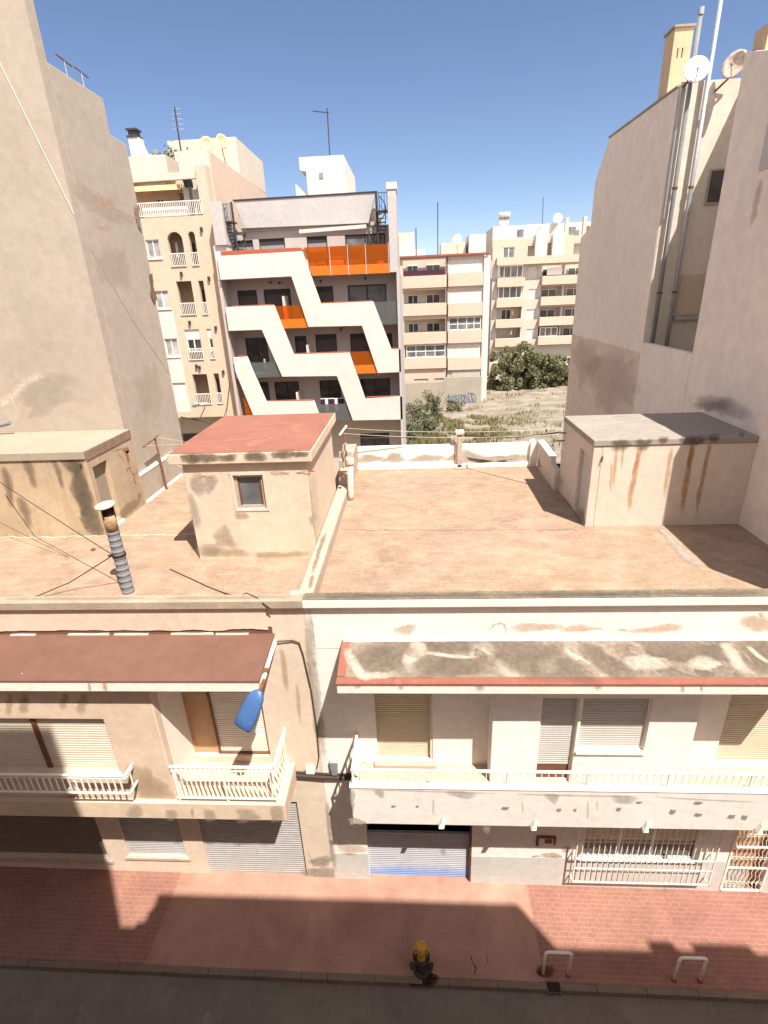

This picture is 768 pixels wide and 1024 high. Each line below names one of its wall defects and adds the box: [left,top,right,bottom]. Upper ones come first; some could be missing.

damp [54,460,101,534]
crack [115,447,141,498]
damp [181,450,307,463]
corrosion [630,451,641,496]
corrosion [682,447,709,502]
peeling [519,623,553,631]